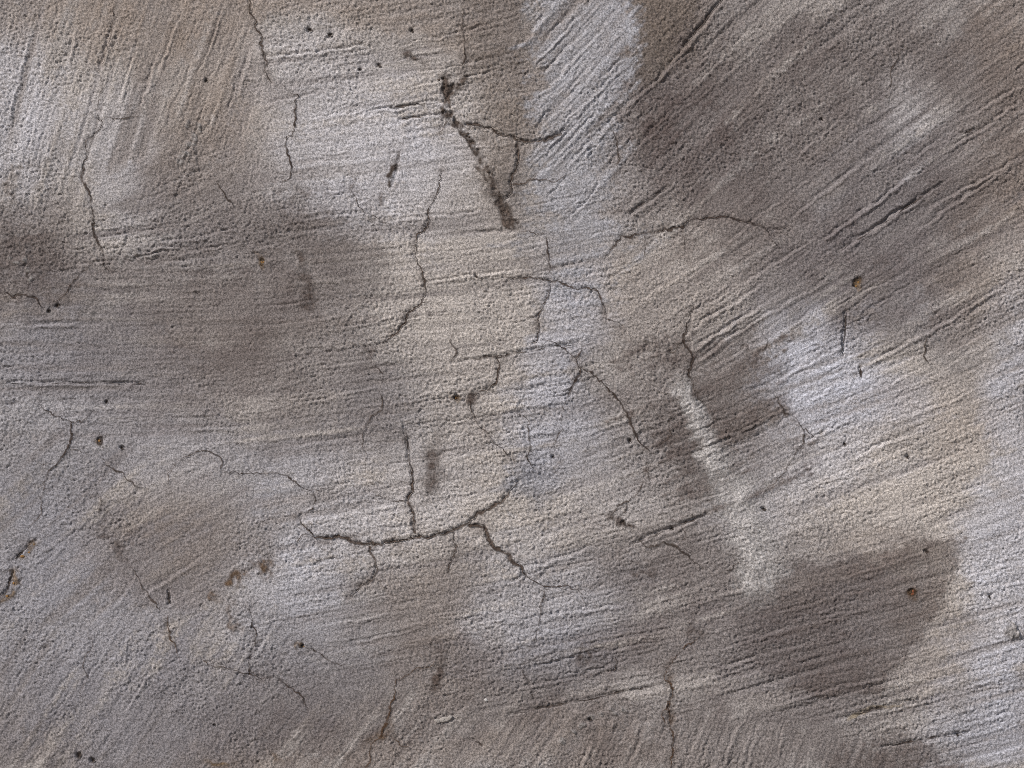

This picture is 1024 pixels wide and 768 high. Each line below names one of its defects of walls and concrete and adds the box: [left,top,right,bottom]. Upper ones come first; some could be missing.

crack [4,11,141,308]
crack [249,0,299,181]
crack [362,173,457,461]
crack [167,230,672,633]
crack [606,215,785,256]